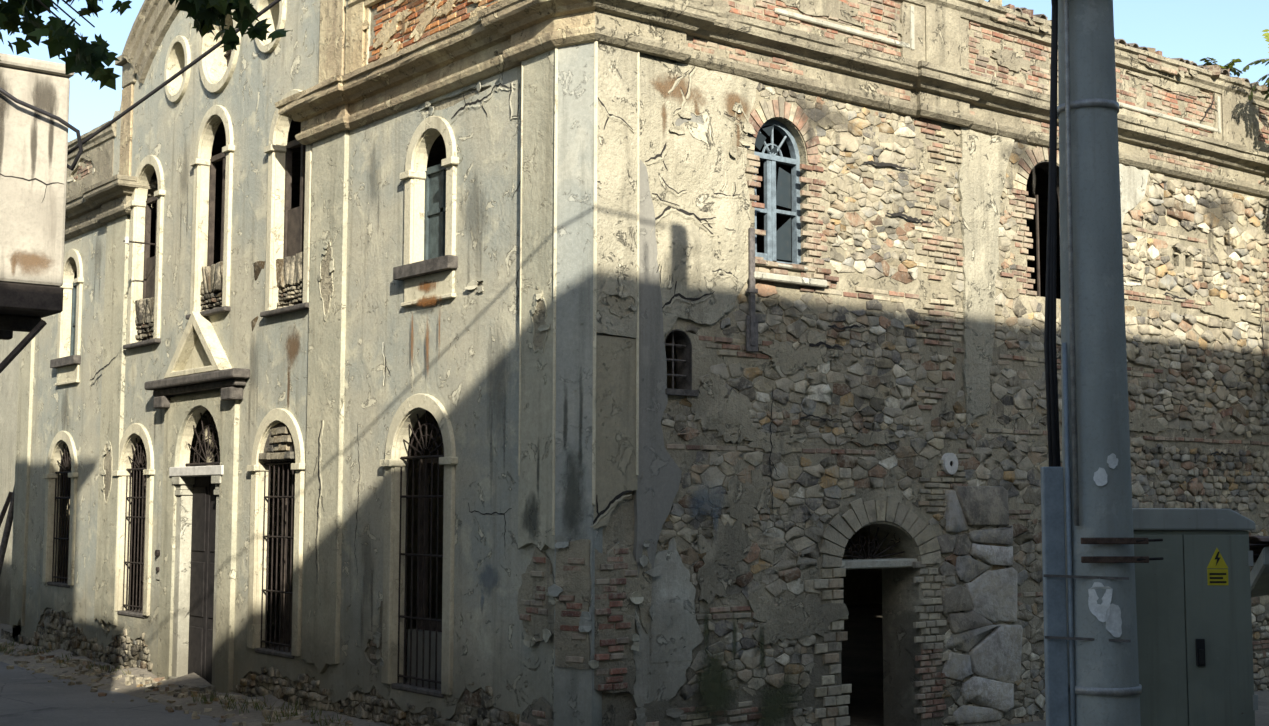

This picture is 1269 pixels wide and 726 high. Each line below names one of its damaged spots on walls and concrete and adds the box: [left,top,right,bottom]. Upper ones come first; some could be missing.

spalling [362,0,502,63]
water stain [0,78,8,166]
water stain [31,84,55,172]
crack [451,81,521,125]
crack [598,98,634,133]
crack [645,67,746,313]
water stain [564,393,583,529]
water stain [524,497,538,536]
crack [590,490,632,528]
flaking render [517,534,684,726]